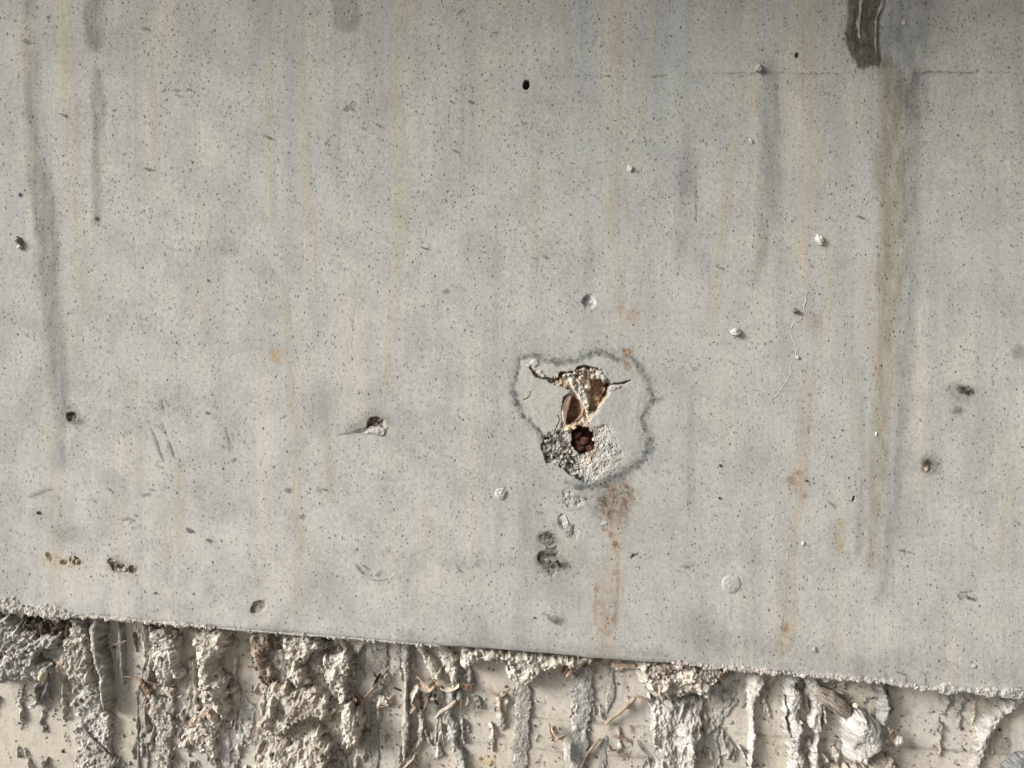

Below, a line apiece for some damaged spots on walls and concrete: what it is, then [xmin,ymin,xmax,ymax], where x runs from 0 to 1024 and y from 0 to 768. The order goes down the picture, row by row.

spalling [512,353,650,580]
spalling [0,595,439,648]
spalling [671,659,1024,700]